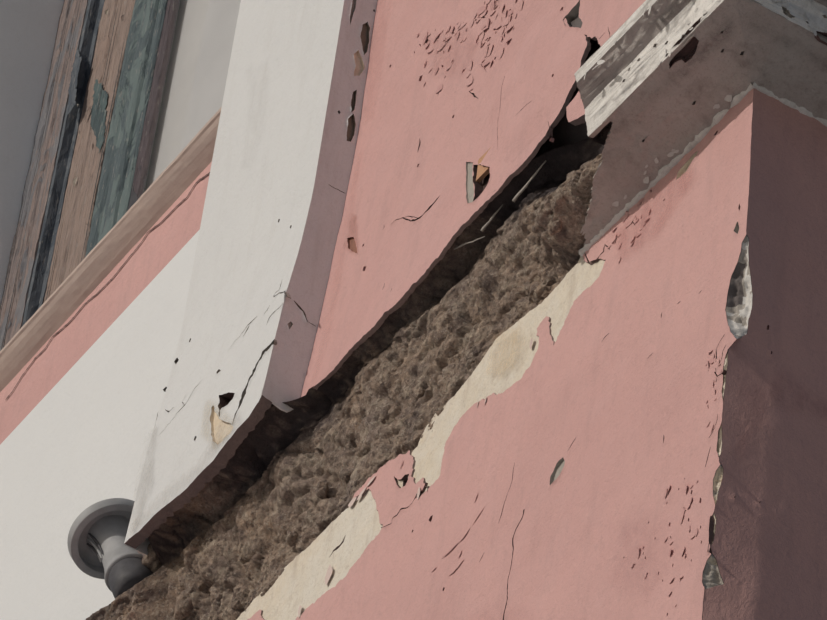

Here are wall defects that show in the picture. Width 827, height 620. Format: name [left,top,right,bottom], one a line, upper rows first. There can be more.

spalling [354,22,370,76]
flaking render [584,43,605,79]
spalling [653,8,707,69]
spalling [338,90,357,142]
crack [392,197,439,223]
crack [232,286,315,345]
spalling [726,222,753,339]
crack [232,339,277,425]
flaking render [86,111,605,620]
spalling [706,421,723,504]
crack [499,502,525,620]
spalling [655,478,724,589]